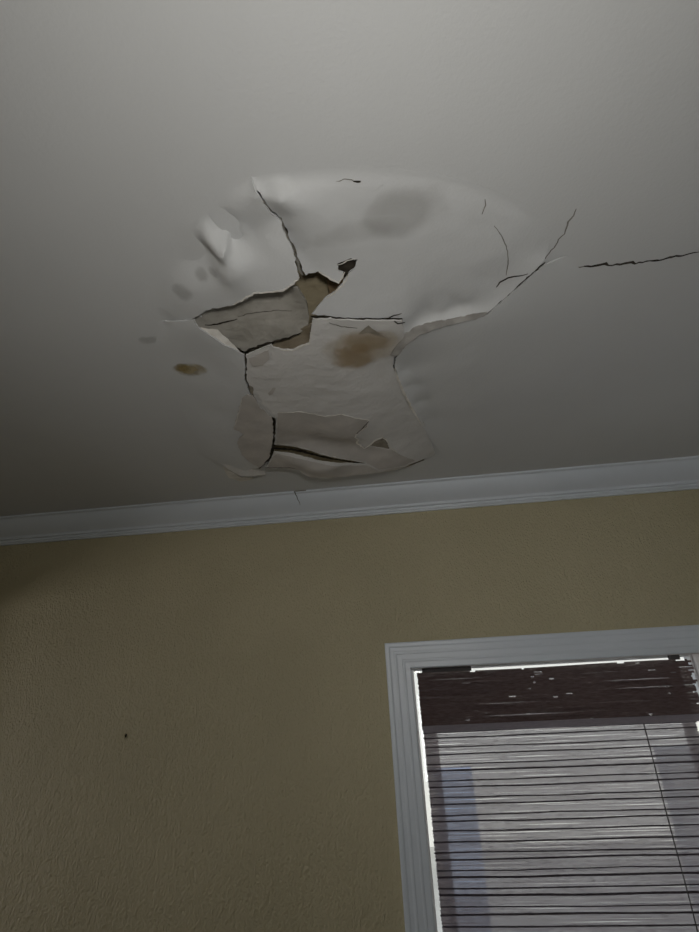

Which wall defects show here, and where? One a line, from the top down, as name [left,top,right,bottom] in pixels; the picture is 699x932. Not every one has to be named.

crack [262,199,303,276]
crack [482,200,576,314]
crack [579,252,699,268]
spalling [193,225,401,395]
crack [311,313,405,328]
leakage [178,365,201,374]
spalling [272,417,363,463]